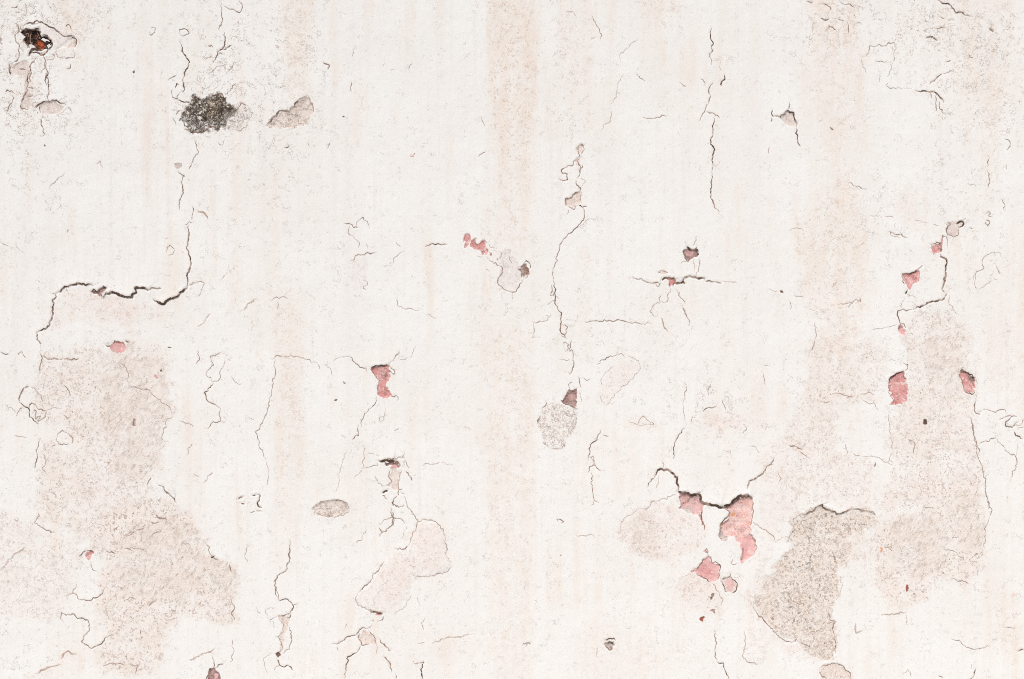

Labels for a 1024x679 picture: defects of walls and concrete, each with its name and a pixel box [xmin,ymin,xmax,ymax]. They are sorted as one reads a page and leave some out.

corrosion [32,31,47,52]
leakage [171,0,339,145]
peeling [264,92,316,132]
crack [680,30,725,211]
peeling [460,231,532,298]
crack [1,142,225,470]
crack [533,208,726,401]
spalling [368,362,396,402]
spalling [865,368,911,408]
spalling [956,367,979,396]
crack [747,458,781,489]
spalling [646,490,759,616]